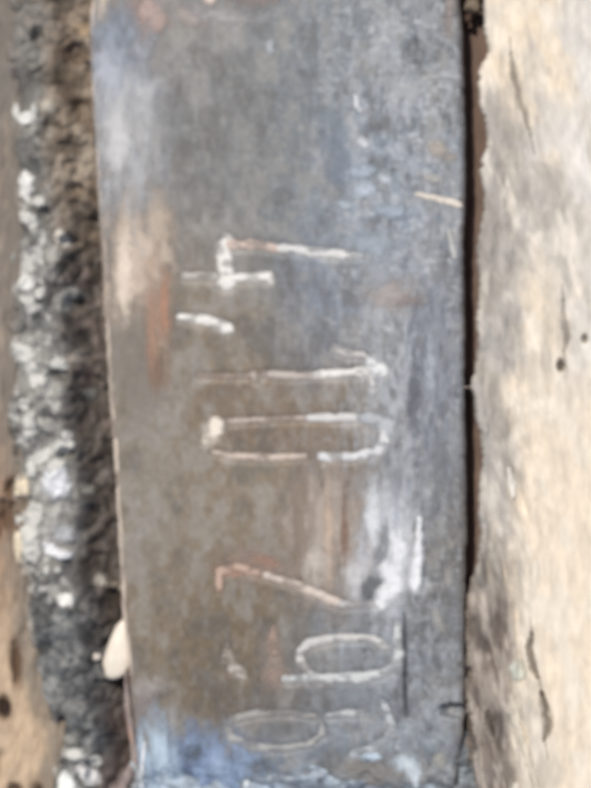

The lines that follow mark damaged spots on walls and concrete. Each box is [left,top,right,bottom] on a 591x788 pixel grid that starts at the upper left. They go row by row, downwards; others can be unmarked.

water stain [12,101,54,126]
water stain [11,169,45,264]
water stain [45,229,72,263]
water stain [16,273,46,300]
water stain [56,288,83,312]
water stain [12,342,87,399]
water stain [13,398,106,576]
water stain [94,574,122,590]
water stain [51,590,90,612]